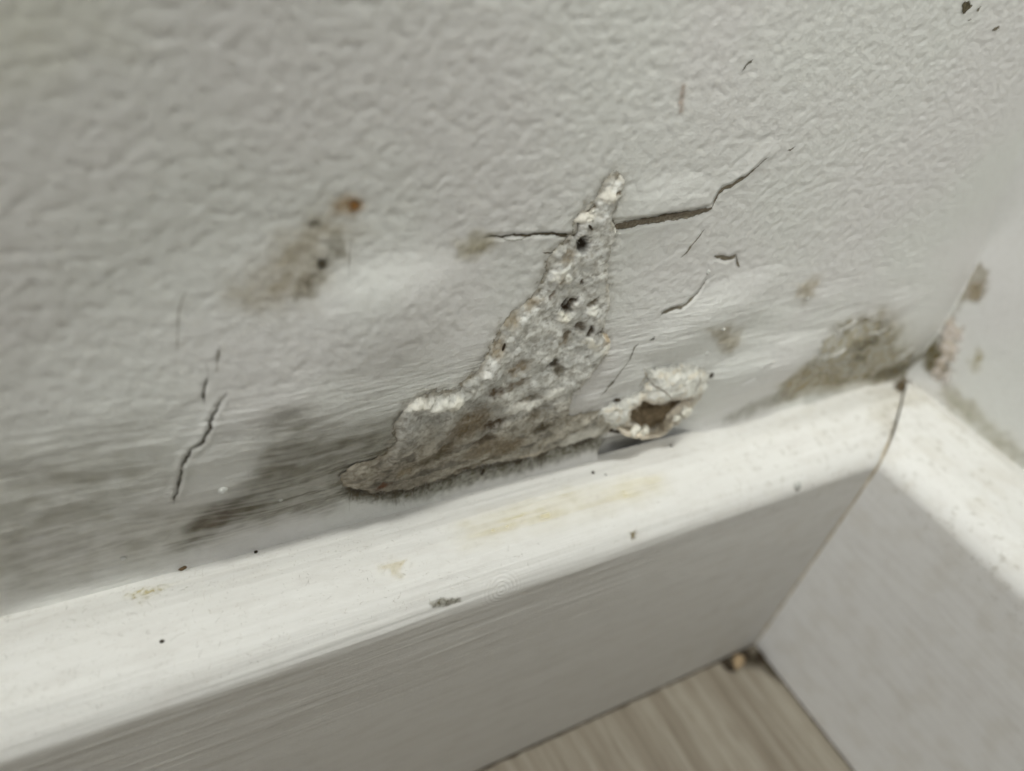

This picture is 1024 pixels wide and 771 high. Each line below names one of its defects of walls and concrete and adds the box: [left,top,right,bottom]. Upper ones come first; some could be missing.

crack [173,349,226,500]
flaking render [338,138,785,508]
crack [604,147,794,393]
peeling [803,319,915,384]
leakage [856,324,946,382]